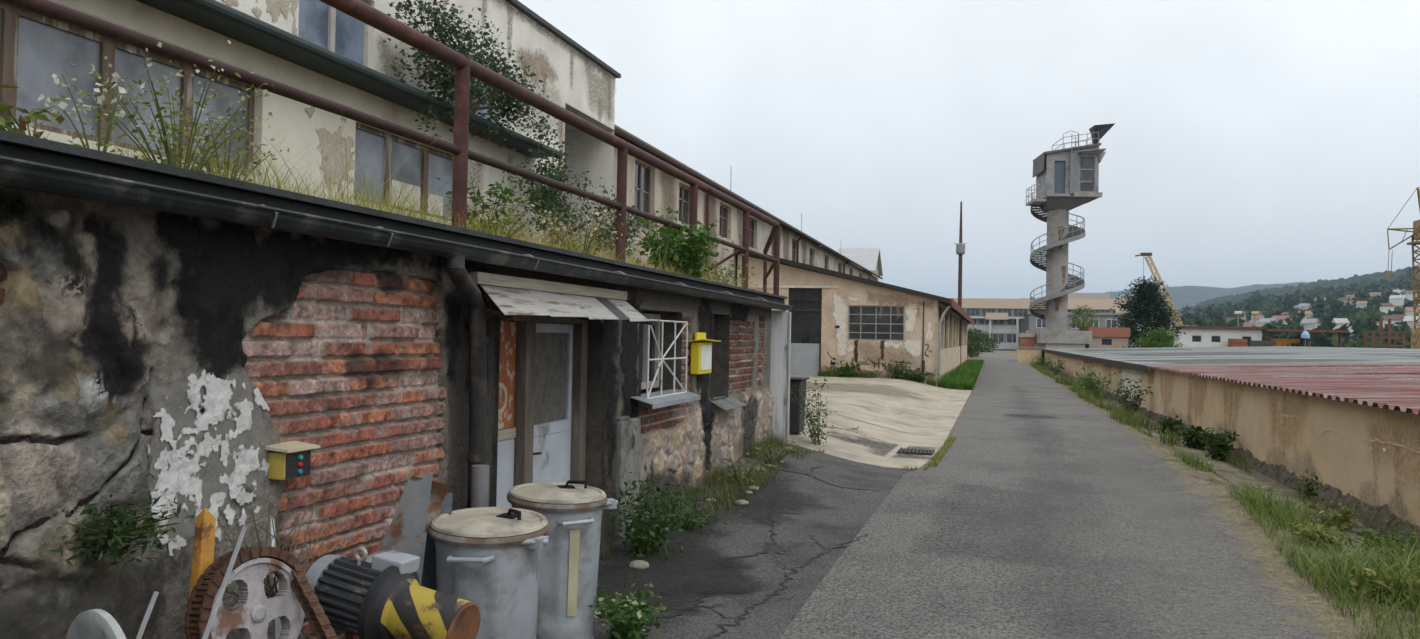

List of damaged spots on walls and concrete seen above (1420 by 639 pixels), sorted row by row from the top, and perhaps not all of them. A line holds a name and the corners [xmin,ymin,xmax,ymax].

peeling [223,0,299,36]
leakage [151,255,242,379]
peeling [821,293,934,382]
crack [0,391,154,568]
spalling [145,269,447,574]
spalling [300,614,317,639]